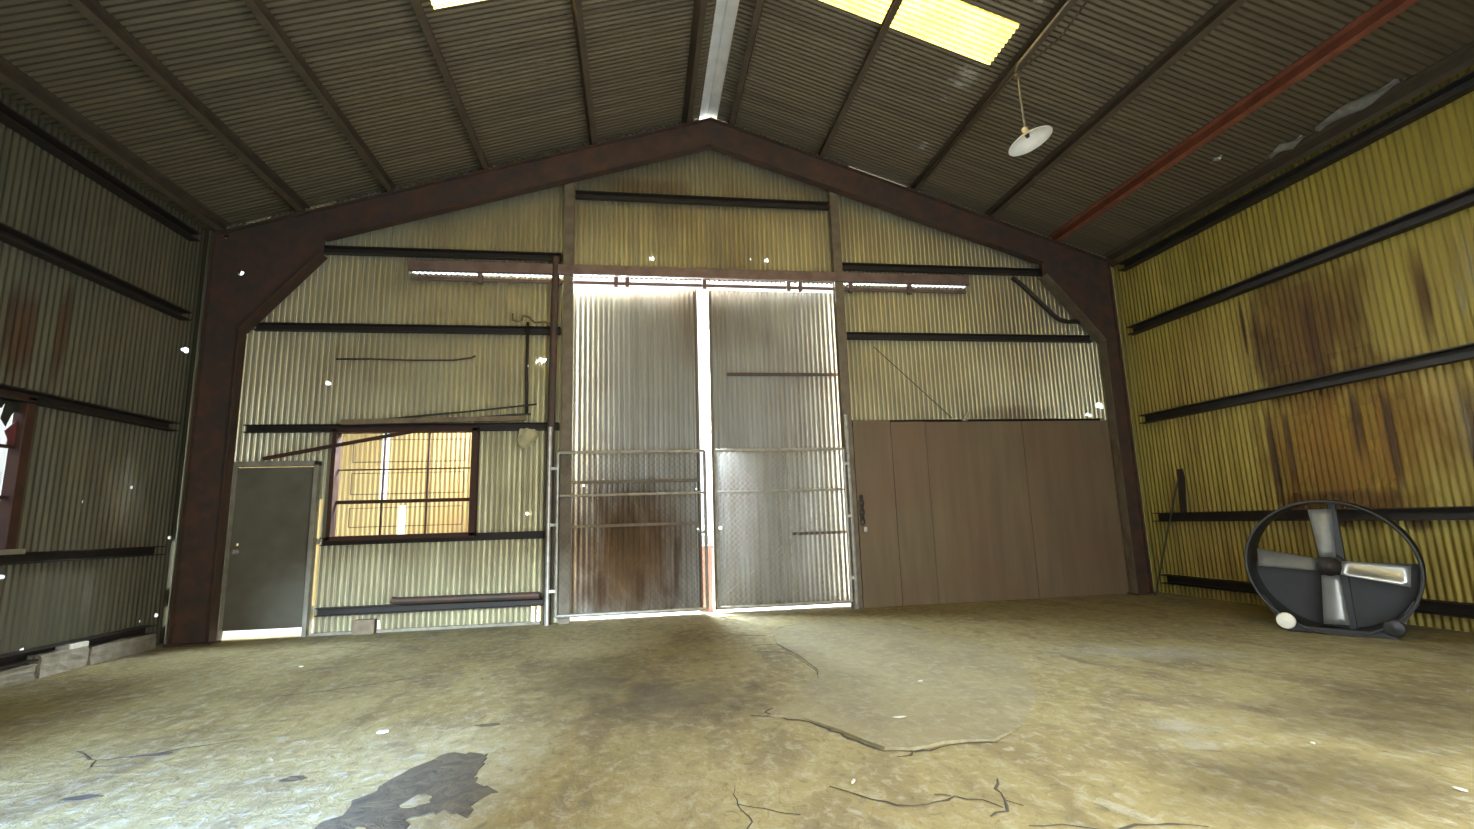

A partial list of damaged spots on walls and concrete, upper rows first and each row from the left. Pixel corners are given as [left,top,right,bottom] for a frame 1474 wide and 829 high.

corrosion [1415,266,1432,320]
crack [751,708,998,757]
crack [829,778,1209,829]